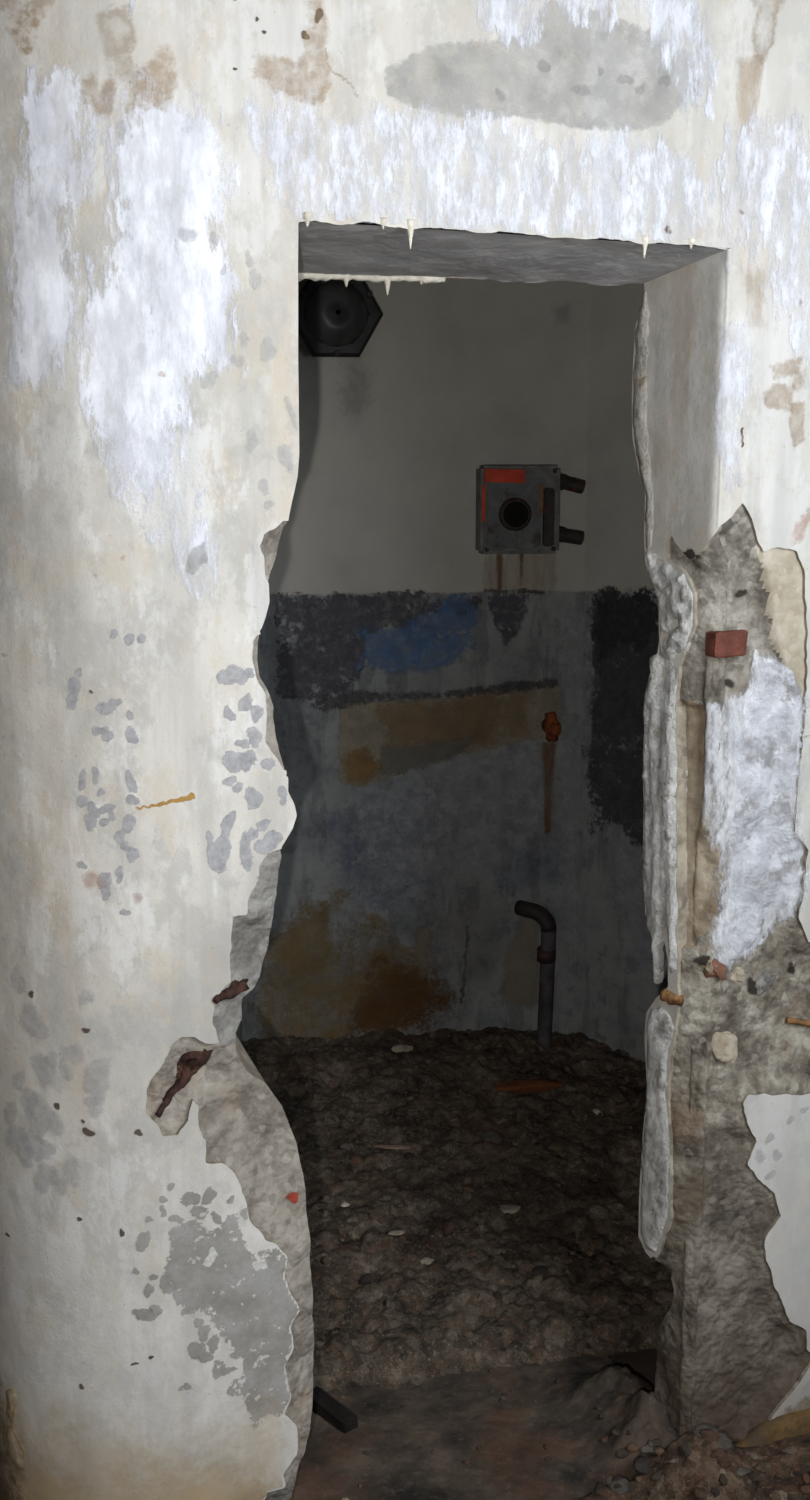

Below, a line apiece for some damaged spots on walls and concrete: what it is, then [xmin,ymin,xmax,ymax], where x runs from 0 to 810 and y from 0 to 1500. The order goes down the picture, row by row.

water stain [6,65,249,599]
water stain [244,0,810,364]
water stain [714,325,752,491]
spalling [120,521,562,1500]
spalling [581,290,810,1442]
water stain [0,1427,267,1500]